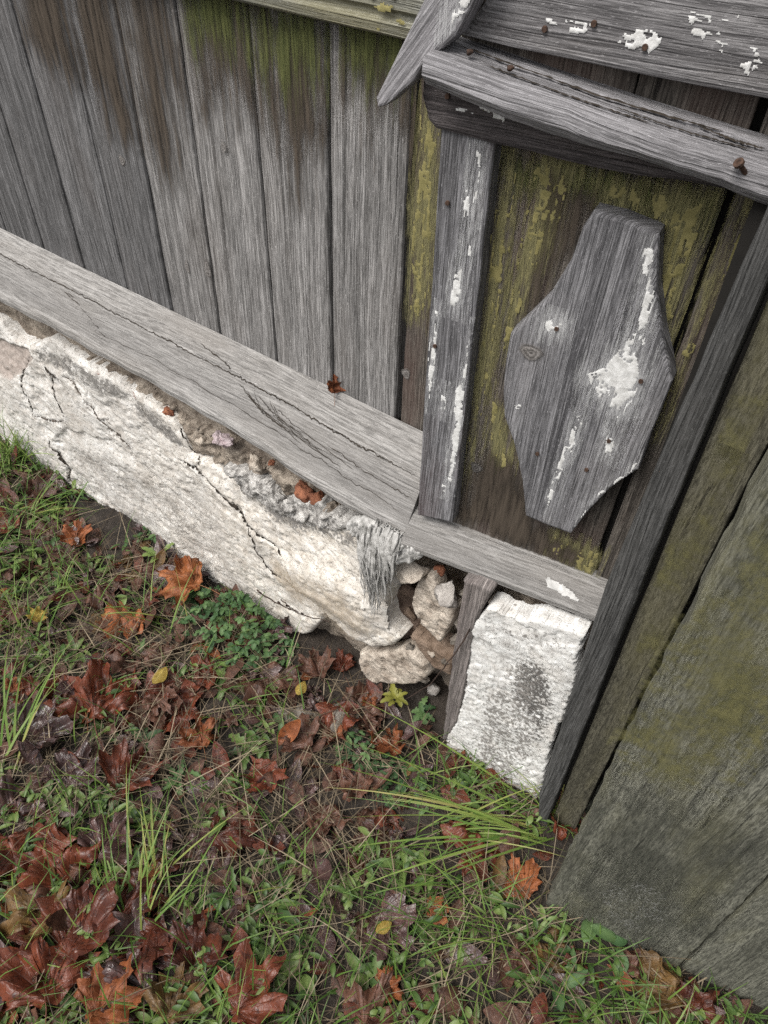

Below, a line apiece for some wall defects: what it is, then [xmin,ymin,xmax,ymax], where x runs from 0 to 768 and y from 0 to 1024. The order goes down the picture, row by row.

peeling [546,18,591,34]
peeling [618,29,662,53]
peeling [688,11,739,53]
peeling [740,47,762,76]
leakage [528,174,594,311]
peeling [407,91,754,522]
crack [0,253,412,505]
crack [180,428,282,577]
spalling [232,483,356,548]
peeling [545,577,579,601]
leakage [468,629,566,781]